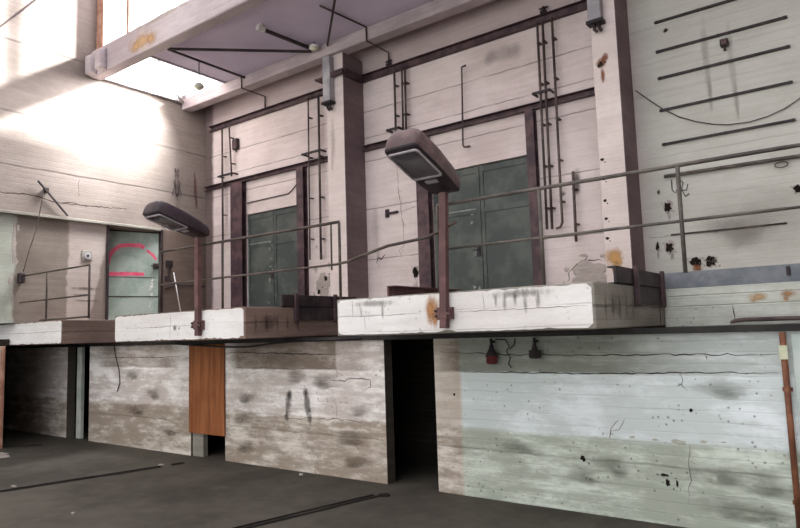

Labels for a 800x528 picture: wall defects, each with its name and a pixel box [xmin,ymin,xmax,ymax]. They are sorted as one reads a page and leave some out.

crack [0,183,124,209]
crack [376,167,408,264]
peeling [313,245,331,296]
spalling [562,254,607,284]
rust [608,252,622,266]
rust [428,301,437,324]
crack [443,352,774,391]